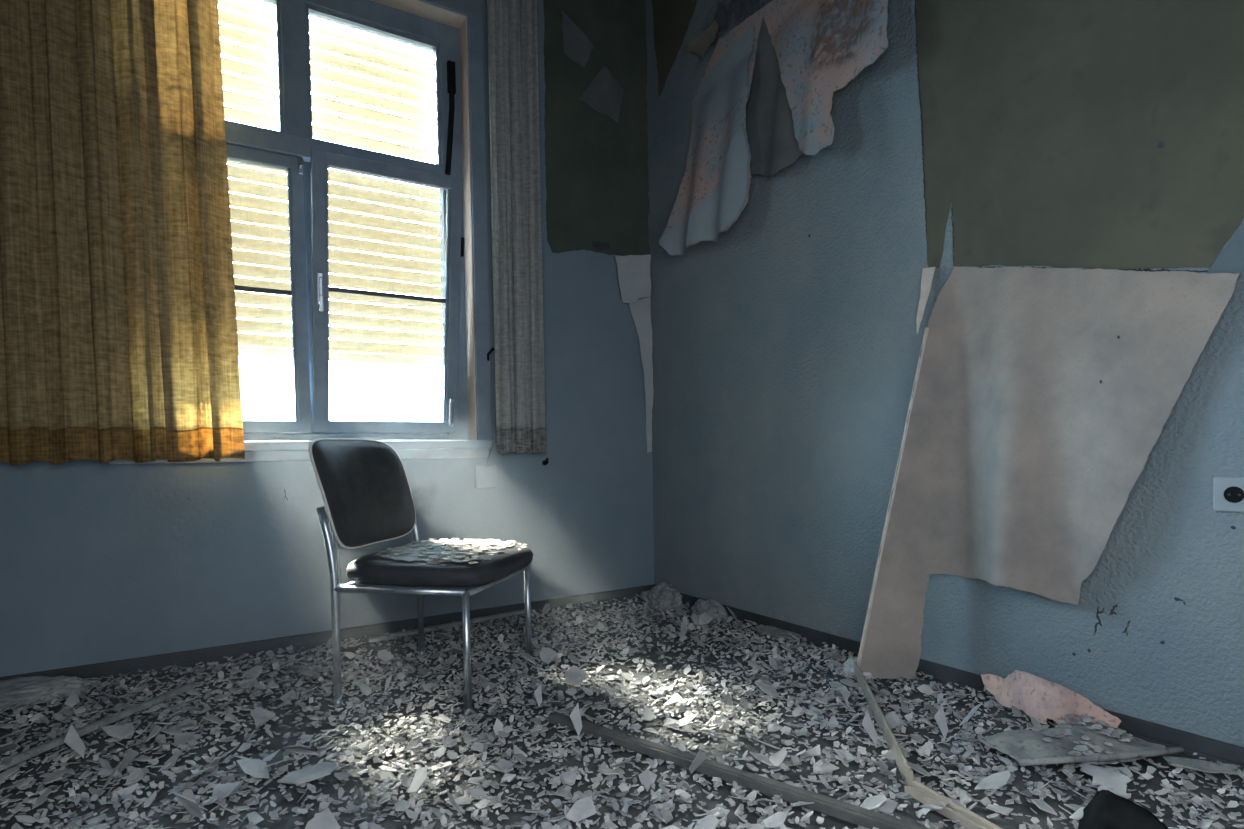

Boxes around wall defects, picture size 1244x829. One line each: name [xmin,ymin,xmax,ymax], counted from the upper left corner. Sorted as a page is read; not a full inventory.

peeling [658,15,803,255]